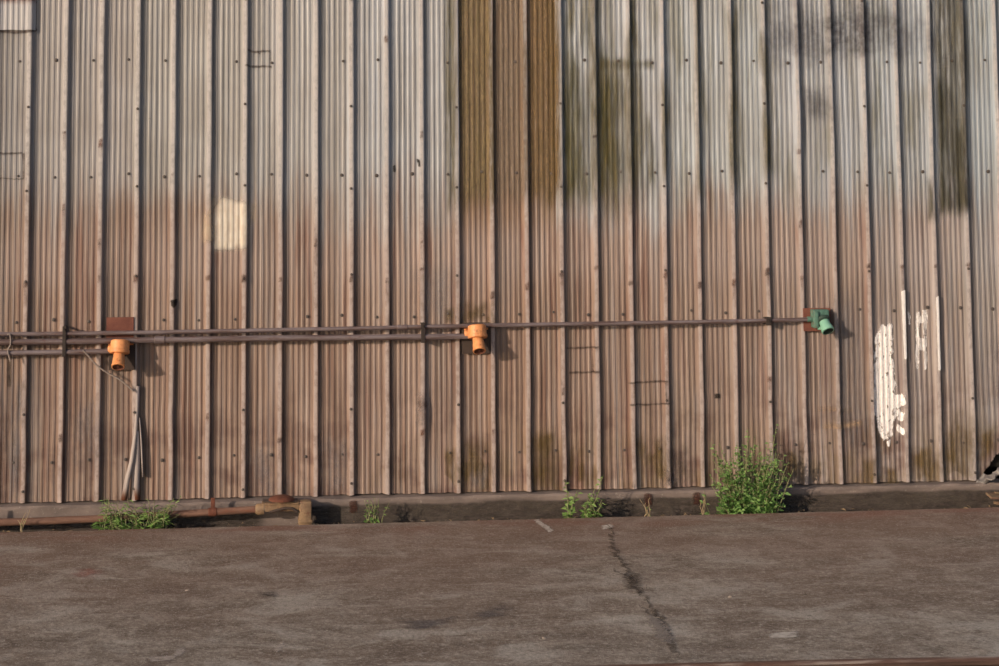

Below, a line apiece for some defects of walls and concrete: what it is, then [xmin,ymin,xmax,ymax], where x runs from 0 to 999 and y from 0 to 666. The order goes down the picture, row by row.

leakage [446,0,570,200]
peeling [874,388,907,447]
crack [607,525,680,655]